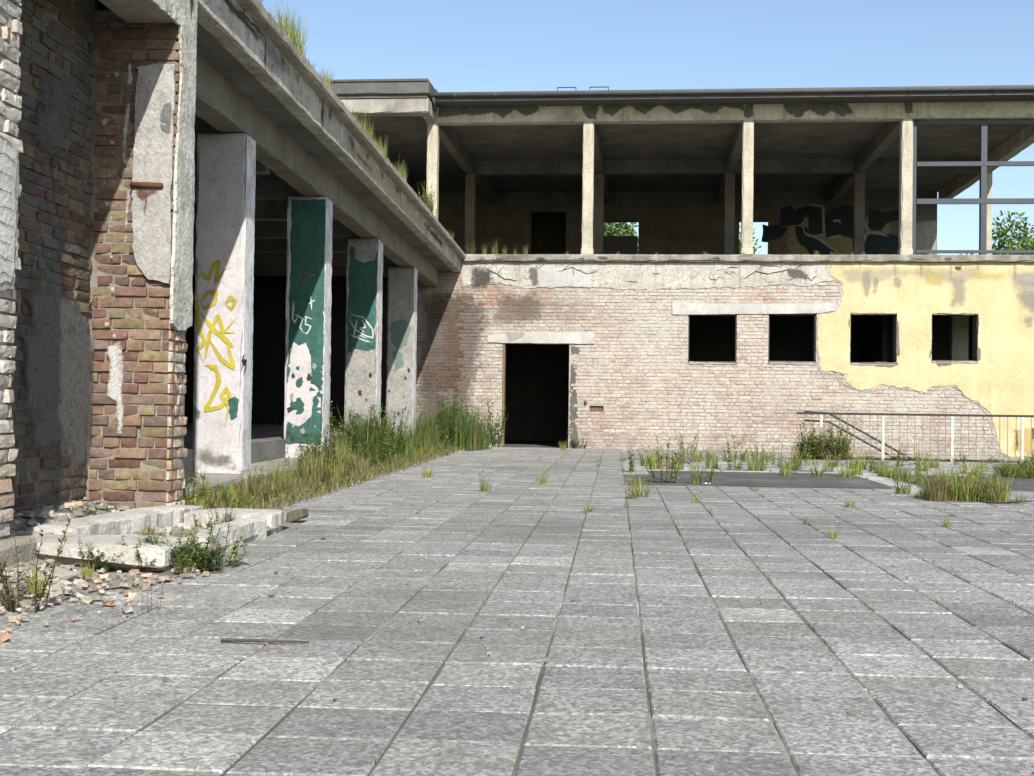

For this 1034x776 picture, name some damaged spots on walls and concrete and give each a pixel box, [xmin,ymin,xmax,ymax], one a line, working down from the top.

crack [226,0,267,70]
flaking render [788,268,807,278]
water stain [848,270,900,294]
peeling [285,199,326,445]
peeling [347,246,378,401]